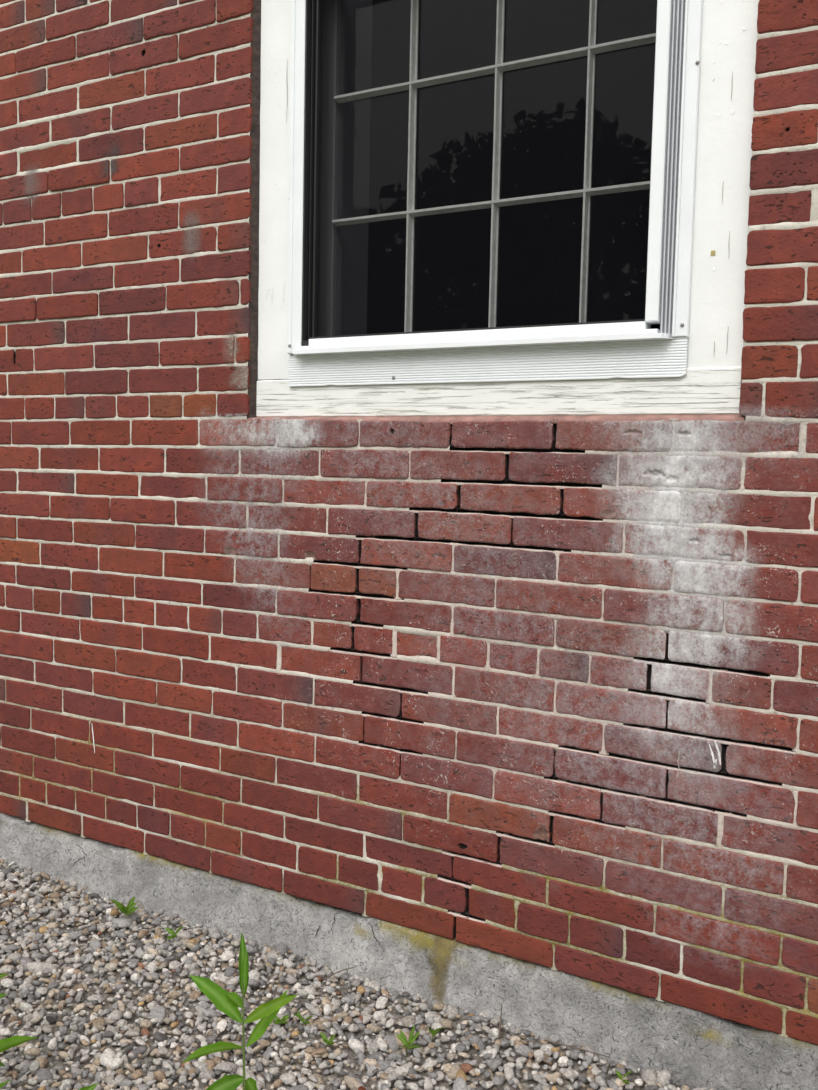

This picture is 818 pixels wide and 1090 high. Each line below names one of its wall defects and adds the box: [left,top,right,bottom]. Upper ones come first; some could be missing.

leakage [237,419,314,476]
leakage [614,419,749,738]
crack [438,633,793,940]
leakage [429,936,458,1000]